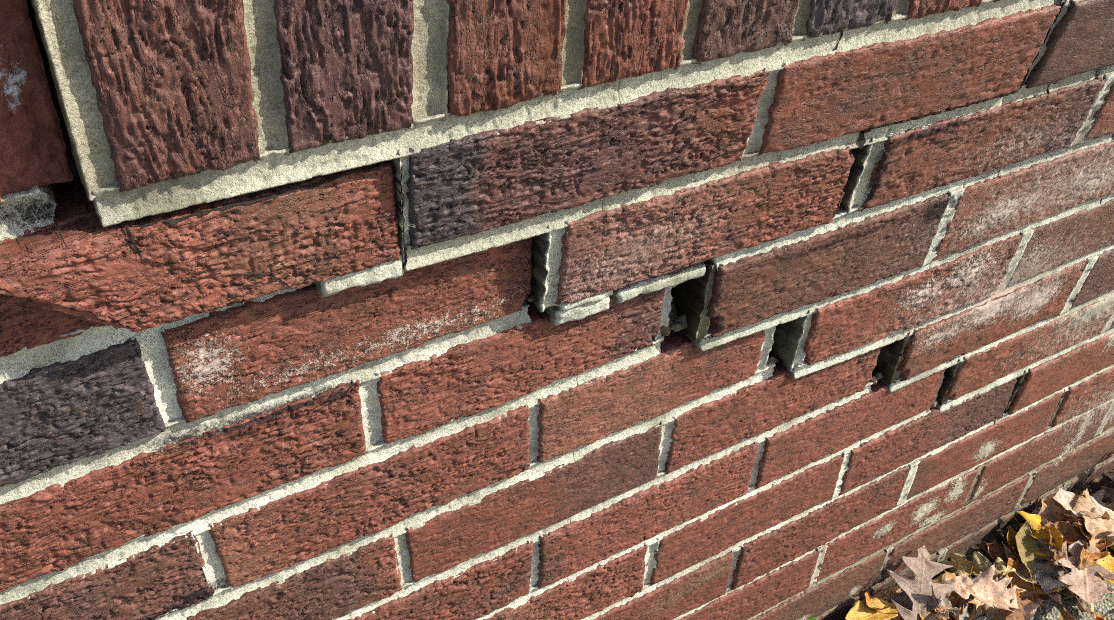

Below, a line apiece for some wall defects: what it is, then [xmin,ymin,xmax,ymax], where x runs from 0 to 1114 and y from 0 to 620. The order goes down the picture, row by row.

damp [0,69,26,108]
spalling [0,0,74,204]
crack [27,0,79,177]
crack [124,162,407,288]
damp [857,109,1114,374]
crack [659,301,687,337]
crack [765,356,779,367]